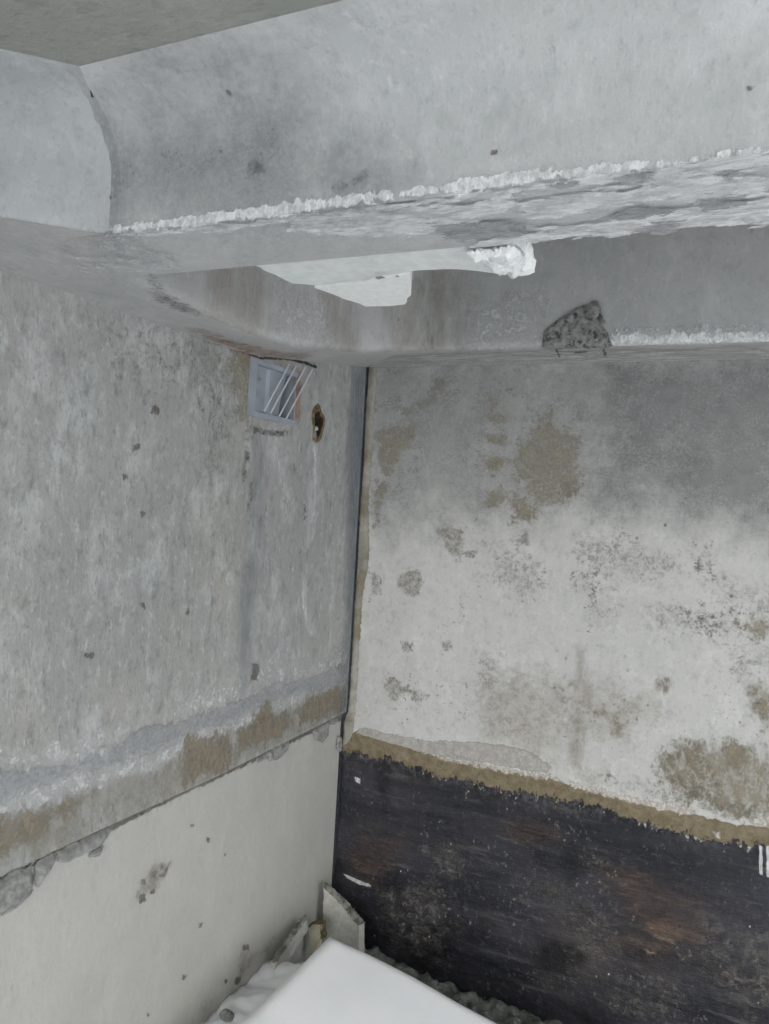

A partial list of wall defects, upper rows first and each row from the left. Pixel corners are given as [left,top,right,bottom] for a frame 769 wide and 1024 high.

leakage [88,113,769,273]
spalling [542,301,612,349]
leakage [374,291,769,520]
leakage [0,618,346,857]
leakage [747,686,769,721]
leakage [424,742,769,827]
spalling [0,826,113,916]
spalling [137,862,171,904]